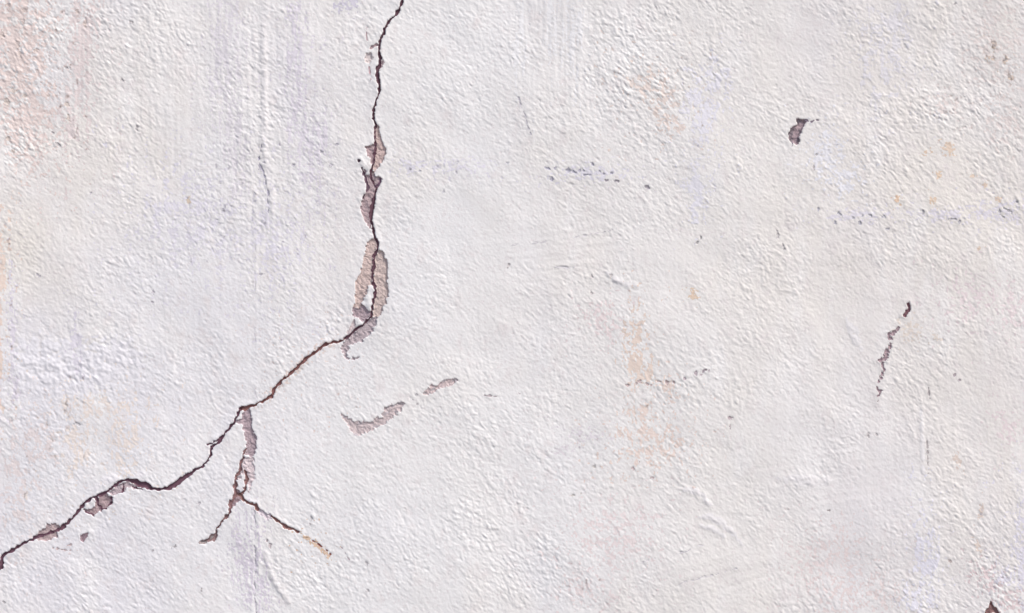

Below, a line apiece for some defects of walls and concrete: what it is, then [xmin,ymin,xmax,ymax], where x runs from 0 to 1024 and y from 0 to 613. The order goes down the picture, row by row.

flaking render [788,118,806,145]
flaking render [340,125,389,360]
crack [0,0,404,613]
crack [876,302,911,402]
flaking render [340,378,458,436]
flaking render [232,409,257,506]